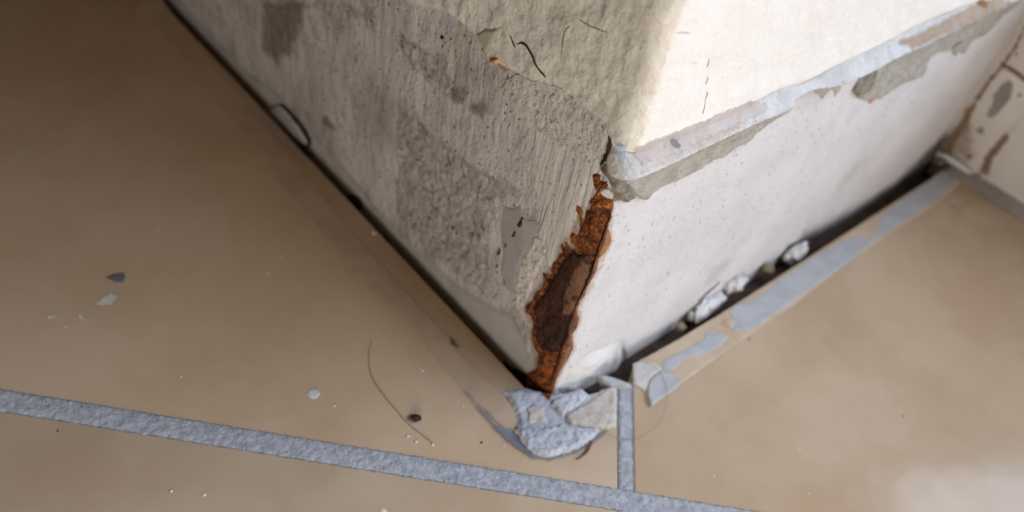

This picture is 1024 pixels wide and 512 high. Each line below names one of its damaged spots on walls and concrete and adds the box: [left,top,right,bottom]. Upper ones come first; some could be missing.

crack [510,36,546,78]
crack [561,19,604,54]
flaking render [814,0,1023,101]
flaking render [600,109,791,202]
flaking render [398,114,548,309]
corrosion [525,174,614,400]